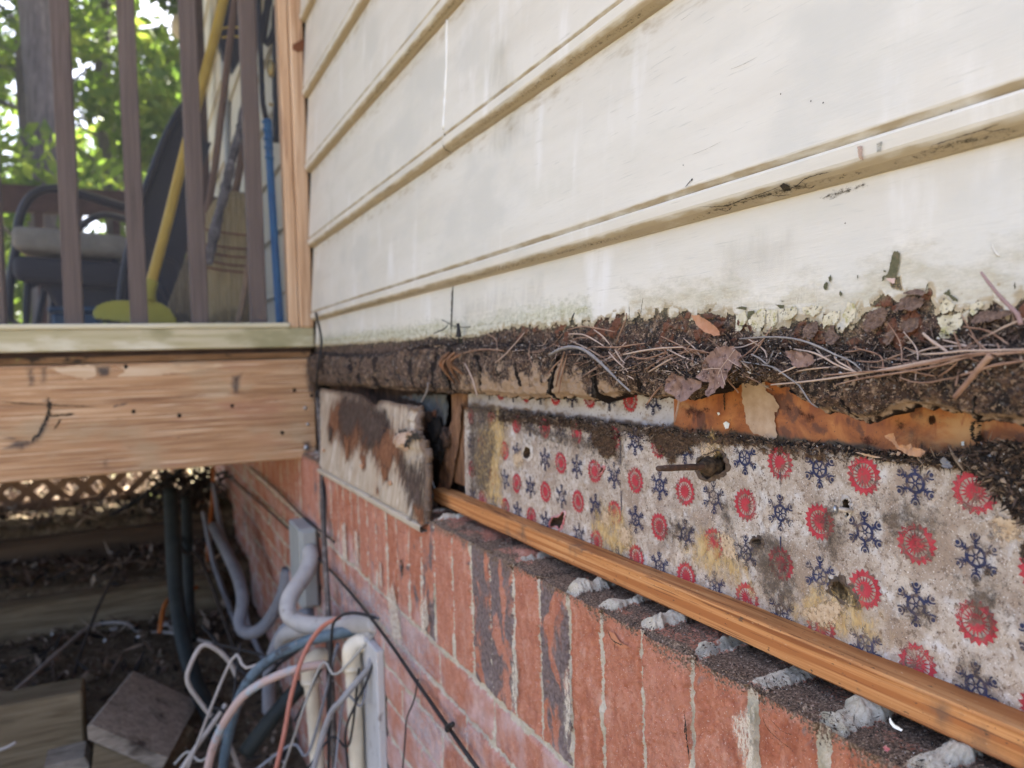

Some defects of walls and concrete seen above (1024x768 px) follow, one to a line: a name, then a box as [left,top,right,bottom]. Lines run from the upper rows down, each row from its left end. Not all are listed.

spalling [735,251,926,345]
peeling [936,289,1012,339]
damp [326,387,428,528]
damp [511,654,519,713]
damp [563,669,571,738]